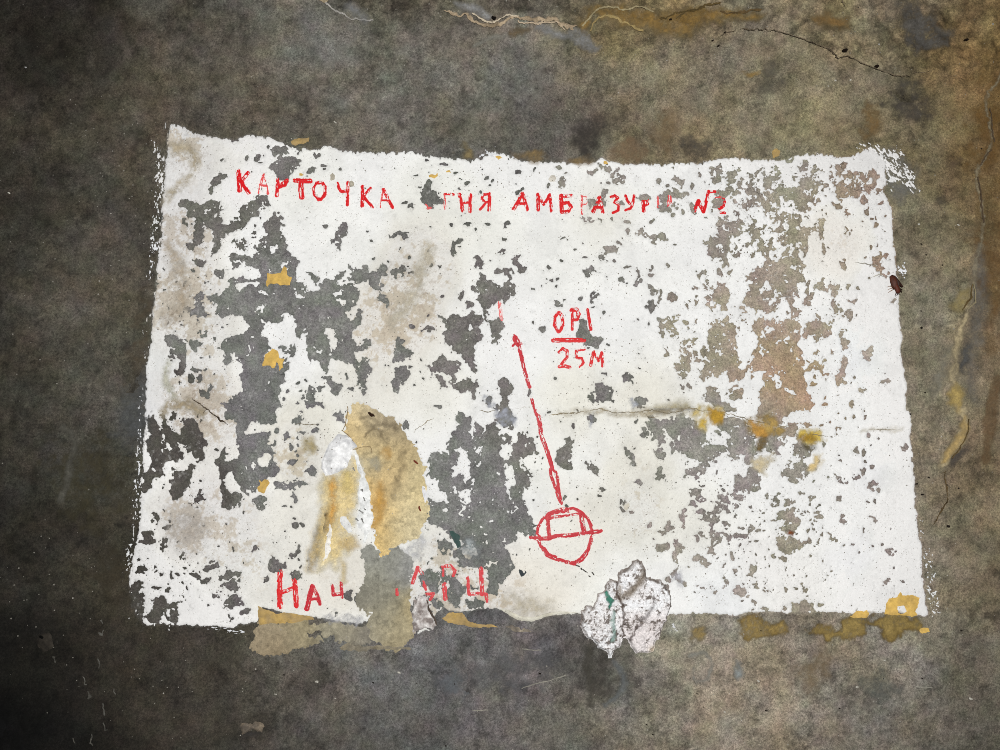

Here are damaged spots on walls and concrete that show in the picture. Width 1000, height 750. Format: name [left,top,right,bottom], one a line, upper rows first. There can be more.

crack [712,28,931,77]
peeling [130,158,641,656]
crack [552,407,828,437]
peeling [560,158,891,614]
peeling [871,543,905,586]